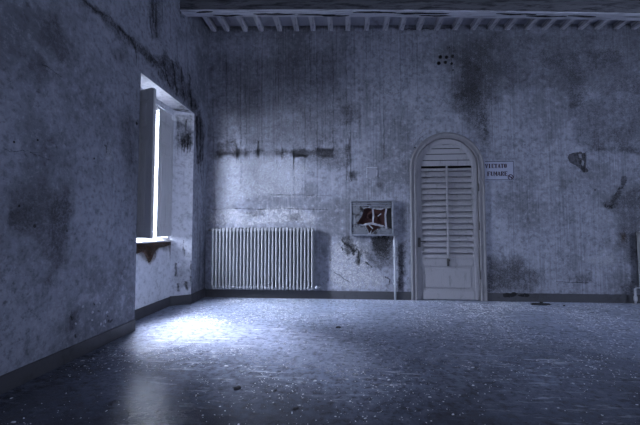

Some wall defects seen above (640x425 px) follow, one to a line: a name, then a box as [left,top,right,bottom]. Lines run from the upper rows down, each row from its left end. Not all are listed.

damp [144,53,204,163]
spalling [568,152,588,173]
damp [369,236,405,274]